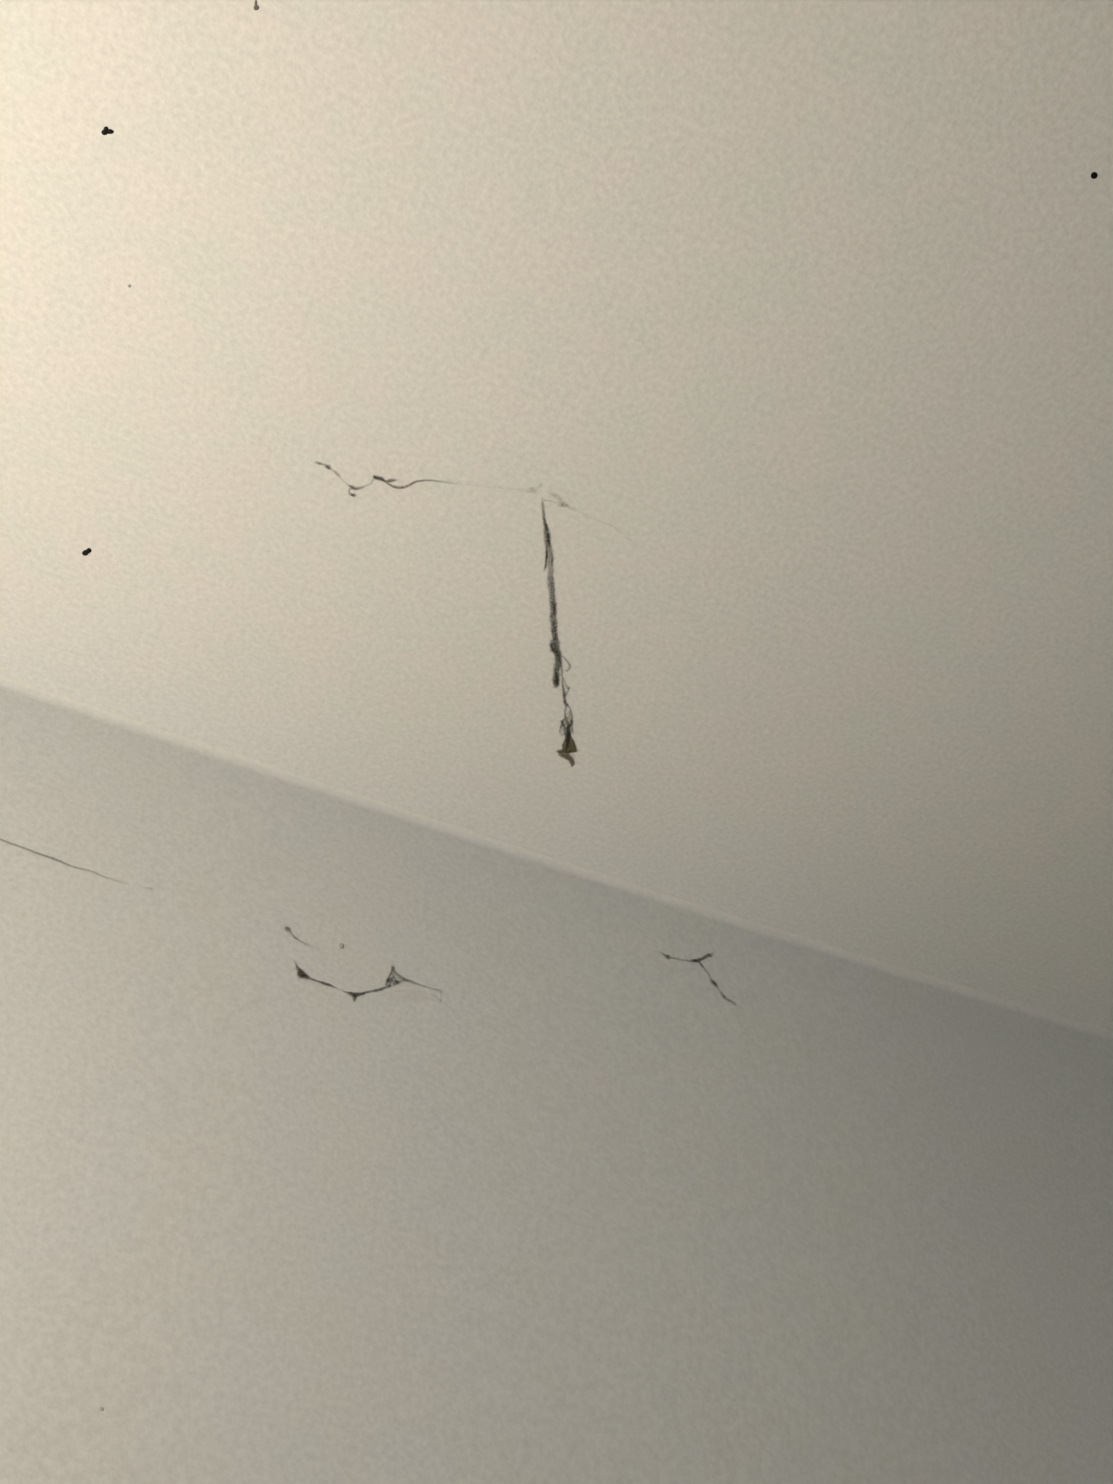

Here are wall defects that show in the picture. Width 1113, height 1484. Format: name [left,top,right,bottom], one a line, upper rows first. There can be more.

crack [319,463,419,496]
crack [543,511,576,766]
crack [297,966,408,1000]